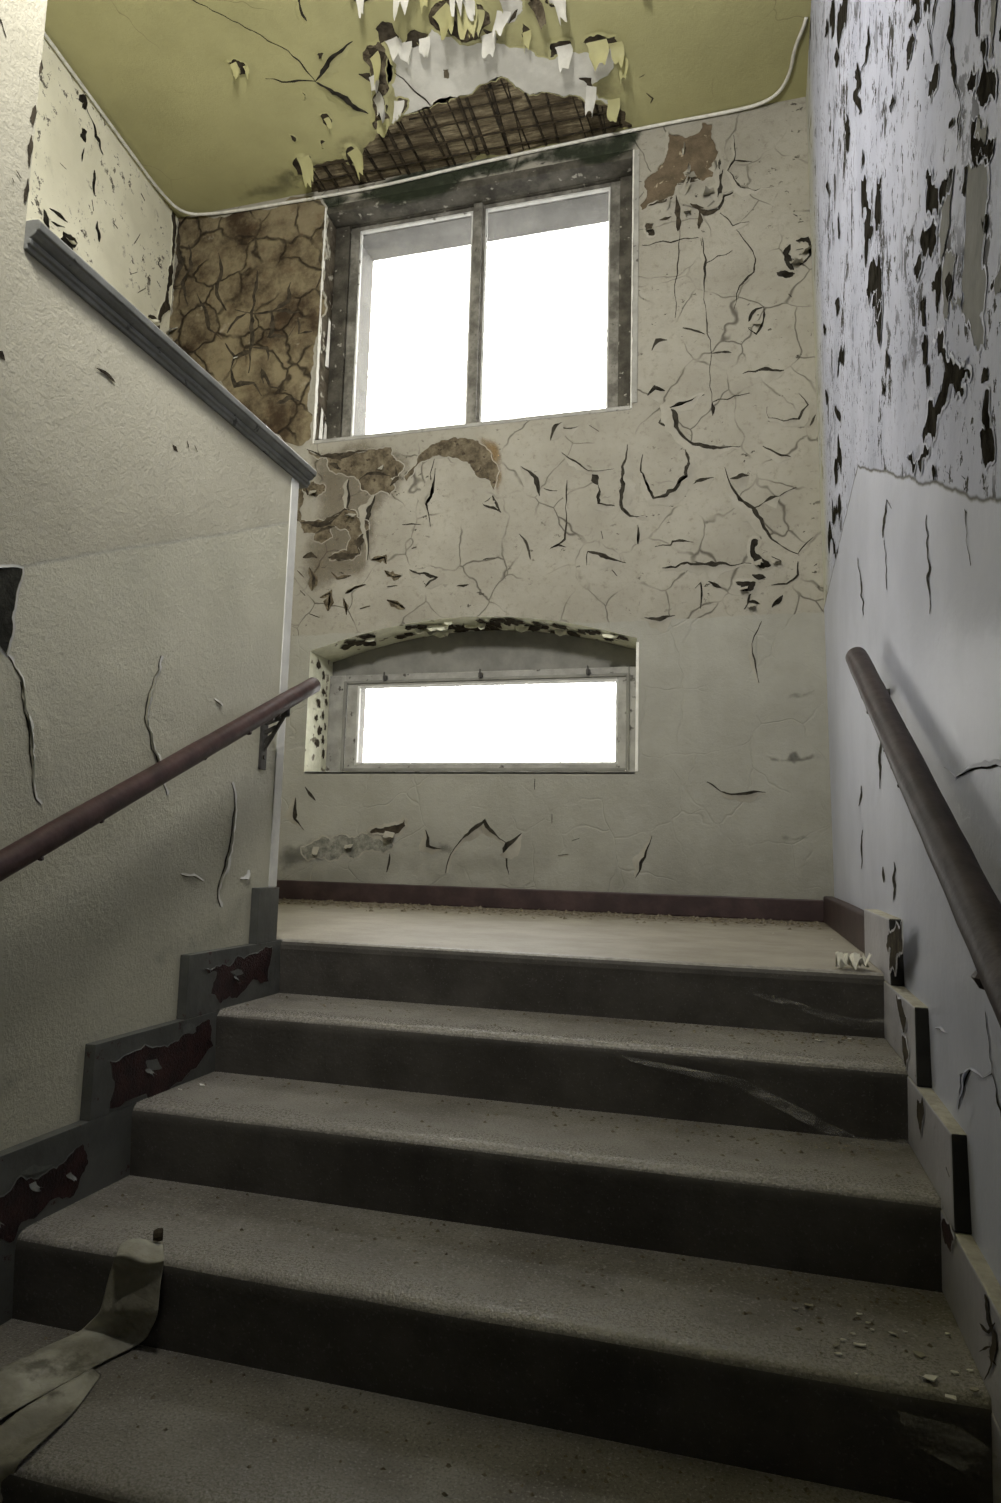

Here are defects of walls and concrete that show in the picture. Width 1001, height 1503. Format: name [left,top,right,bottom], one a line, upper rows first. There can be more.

crack [193,0,368,117]
peeling [825,0,848,68]
flaking render [639,120,724,245]
peeling [845,26,889,395]
peeling [906,0,1001,480]
flaking render [130,0,654,642]
crack [482,135,816,582]
crack [342,458,436,560]
flaking render [0,564,25,657]
crack [409,558,491,589]
crack [8,655,43,805]
crack [386,819,522,874]